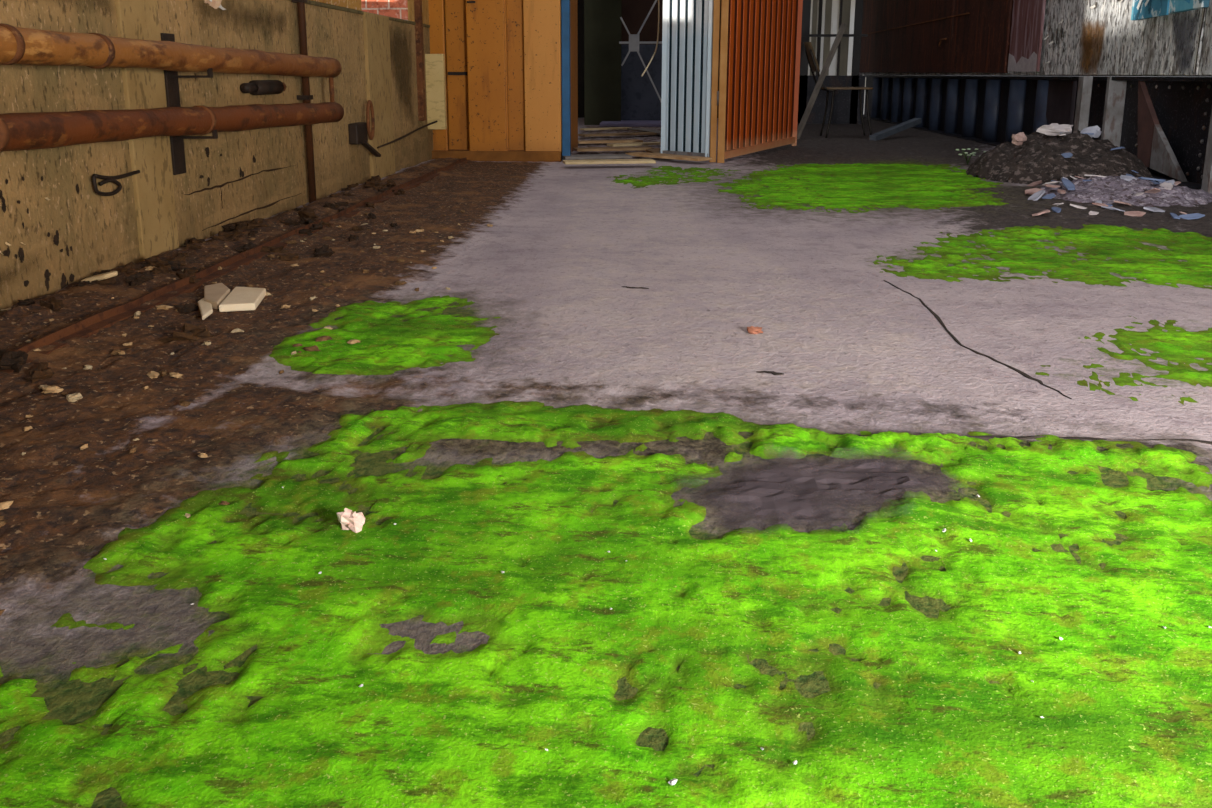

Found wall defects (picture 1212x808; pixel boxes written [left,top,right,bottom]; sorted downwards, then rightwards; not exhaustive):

rust [859,0,1014,73]
spalling [0,177,29,263]
spalling [47,230,73,256]
spalling [45,269,75,291]
crack [884,280,1072,399]
crack [967,435,1212,445]